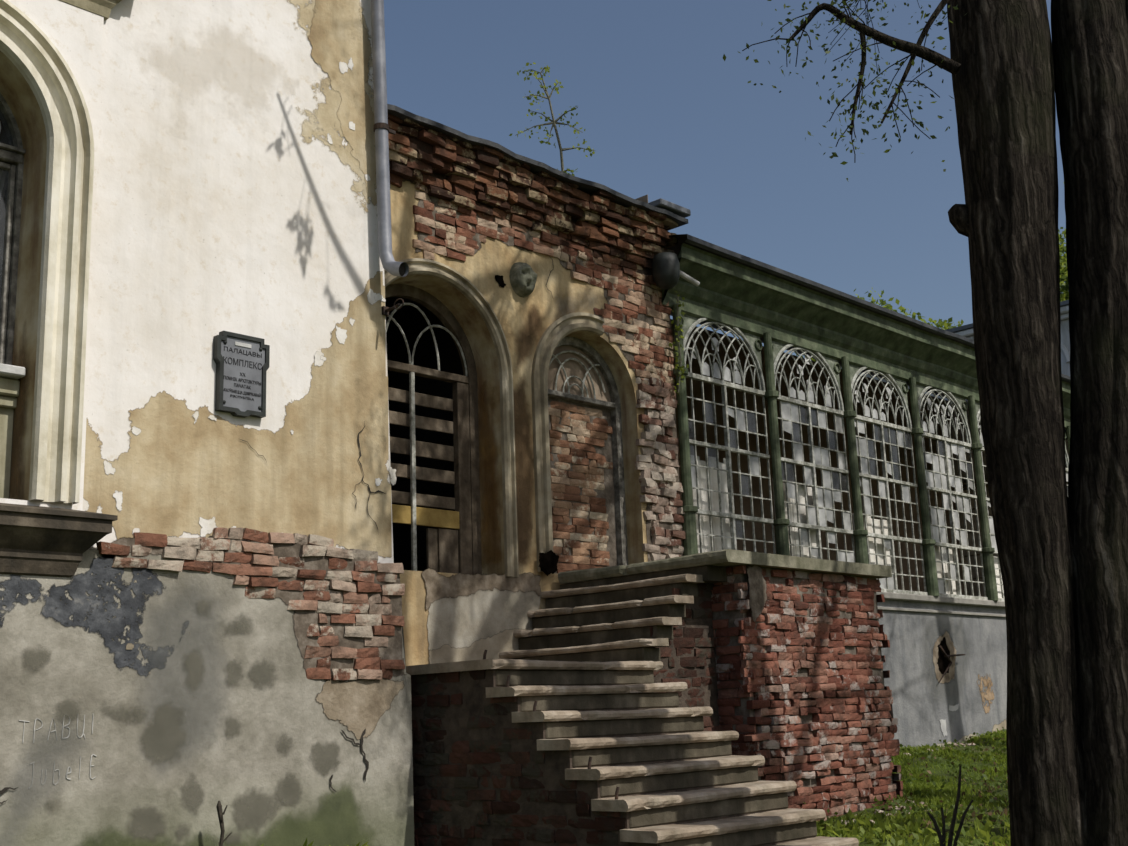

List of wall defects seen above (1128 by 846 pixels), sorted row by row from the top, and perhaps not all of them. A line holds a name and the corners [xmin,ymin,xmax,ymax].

flaking render [287,0,686,562]
crack [352,421,386,529]
flaking render [0,271,406,740]
flaking render [422,550,559,664]
damp [25,650,50,669]
damp [227,661,275,688]
hole [933,631,965,684]
damp [104,705,185,762]
damp [312,742,339,775]
crack [341,728,369,782]
damp [183,777,204,813]
damp [234,775,301,829]